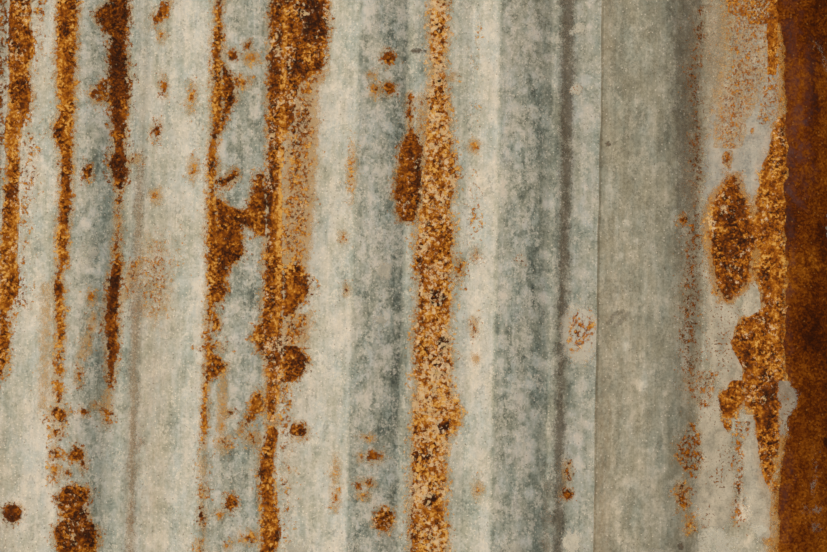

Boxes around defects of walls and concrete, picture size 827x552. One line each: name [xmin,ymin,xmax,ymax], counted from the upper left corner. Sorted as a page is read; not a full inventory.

corrosion [0,0,193,552]
corrosion [180,0,337,552]
corrosion [344,131,361,209]
corrosion [324,434,388,512]
corrosion [363,0,486,552]
corrosion [557,298,597,368]
corrosion [668,0,827,552]